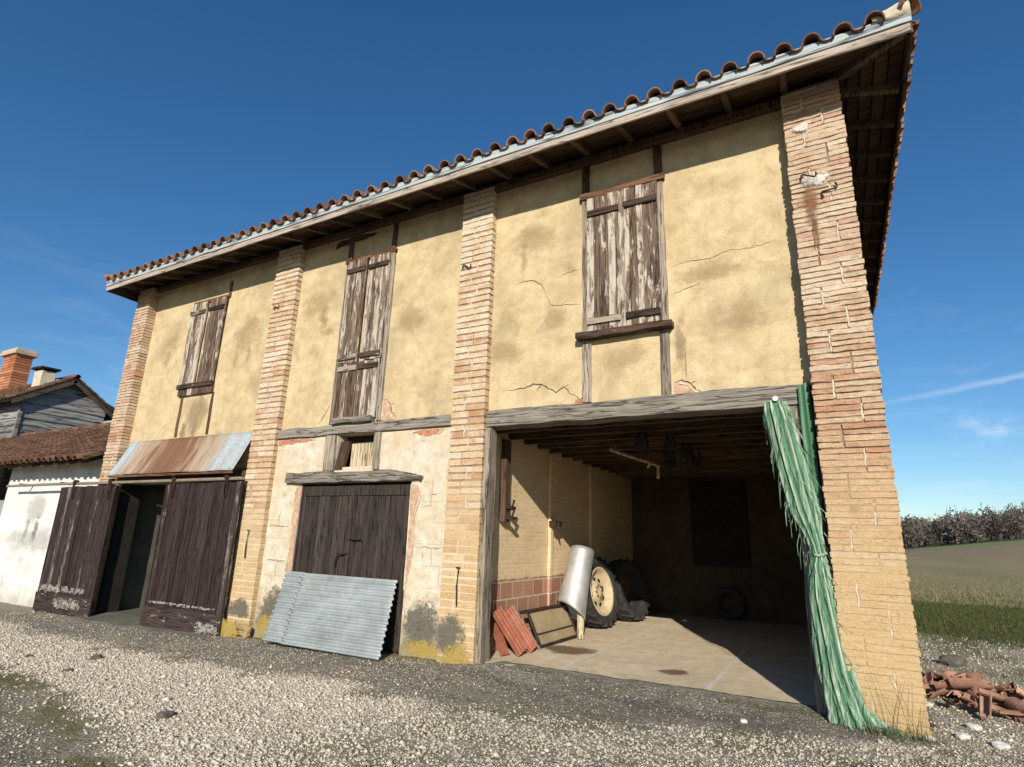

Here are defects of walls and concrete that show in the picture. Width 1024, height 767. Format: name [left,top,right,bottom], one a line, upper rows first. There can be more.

rust [805,185,820,247]
crack [673,240,774,293]
crack [515,383,578,398]
spalling [672,382,699,395]
spalling [403,484,421,590]
water stain [227,586,280,625]
water stain [403,601,465,654]